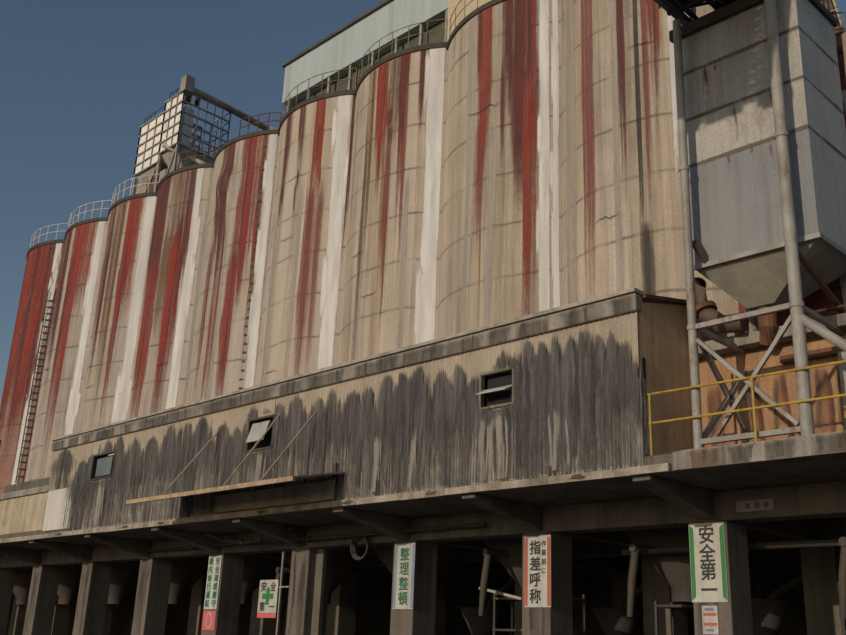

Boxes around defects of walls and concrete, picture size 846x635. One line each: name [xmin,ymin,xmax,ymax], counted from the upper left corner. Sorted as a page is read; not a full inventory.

corrosion [0,222,95,435]
corrosion [93,197,144,393]
corrosion [130,169,197,410]
corrosion [199,135,268,395]
corrosion [278,106,306,218]
corrosion [298,98,326,340]
water stain [37,327,649,530]
corrosion [355,53,410,305]
corrosion [476,0,538,311]
corrosion [616,0,626,146]
corrosion [641,0,659,152]